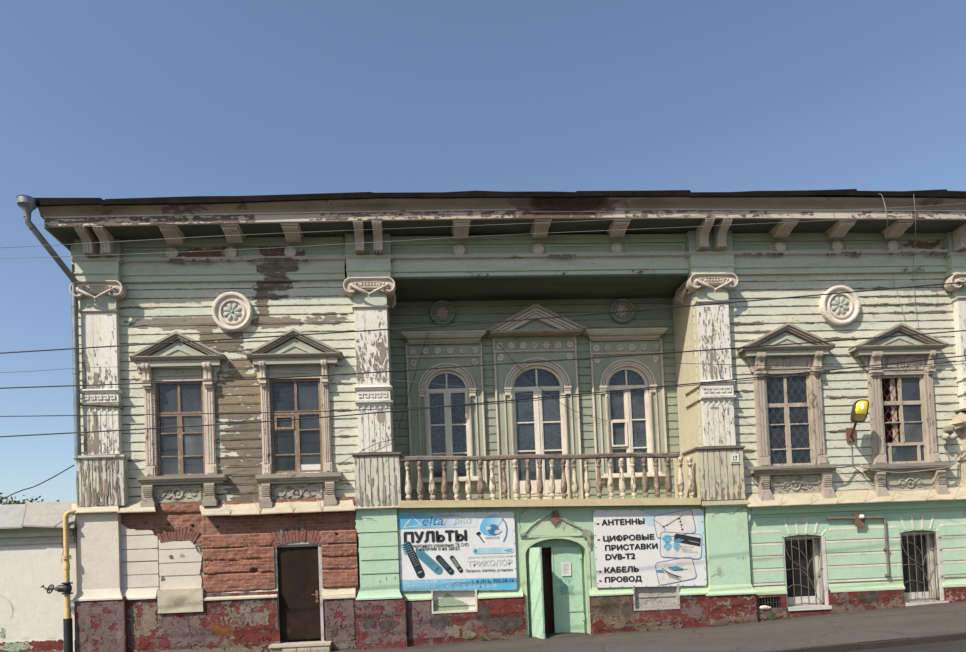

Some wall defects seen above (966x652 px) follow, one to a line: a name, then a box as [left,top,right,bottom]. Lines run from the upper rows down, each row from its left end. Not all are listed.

peeling [309,197,814,220]
peeling [859,286,950,315]
peeling [698,306,771,379]
flaking render [75,246,524,652]
peeling [699,390,753,500]
flaking render [591,595,635,631]
flaking render [830,591,965,613]